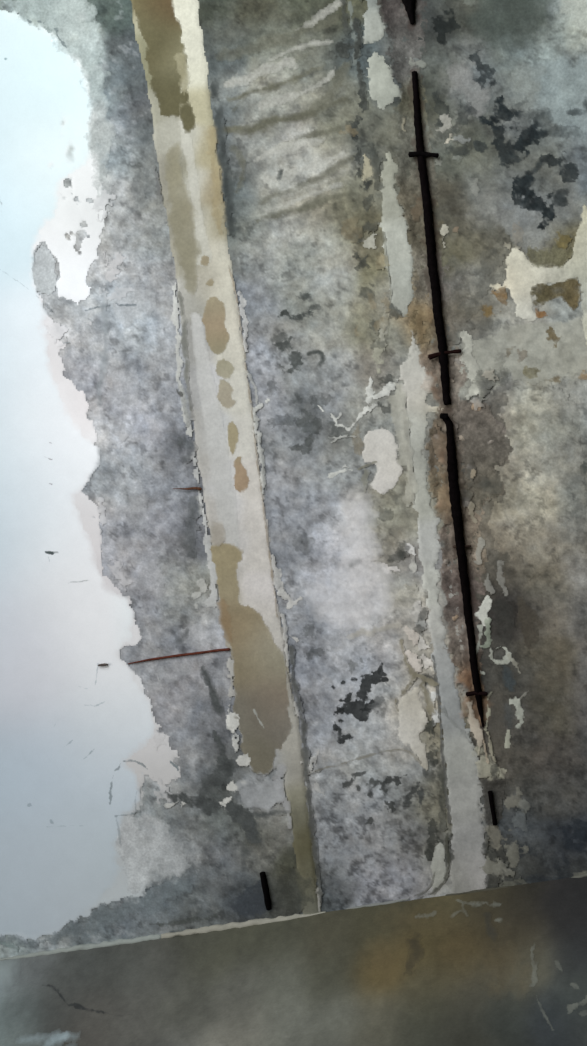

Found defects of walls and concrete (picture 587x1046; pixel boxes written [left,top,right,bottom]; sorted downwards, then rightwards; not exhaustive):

damp [133,0,403,494]
damp [429,0,587,345]
peeling [0,0,226,940]
corrosion [406,67,490,733]
spalling [362,0,587,698]
damp [470,352,514,451]
damp [229,866,322,917]
damp [342,719,455,870]
peeling [397,687,429,771]
peeling [430,842,446,892]
damp [517,817,587,969]
damp [15,1028,81,1046]